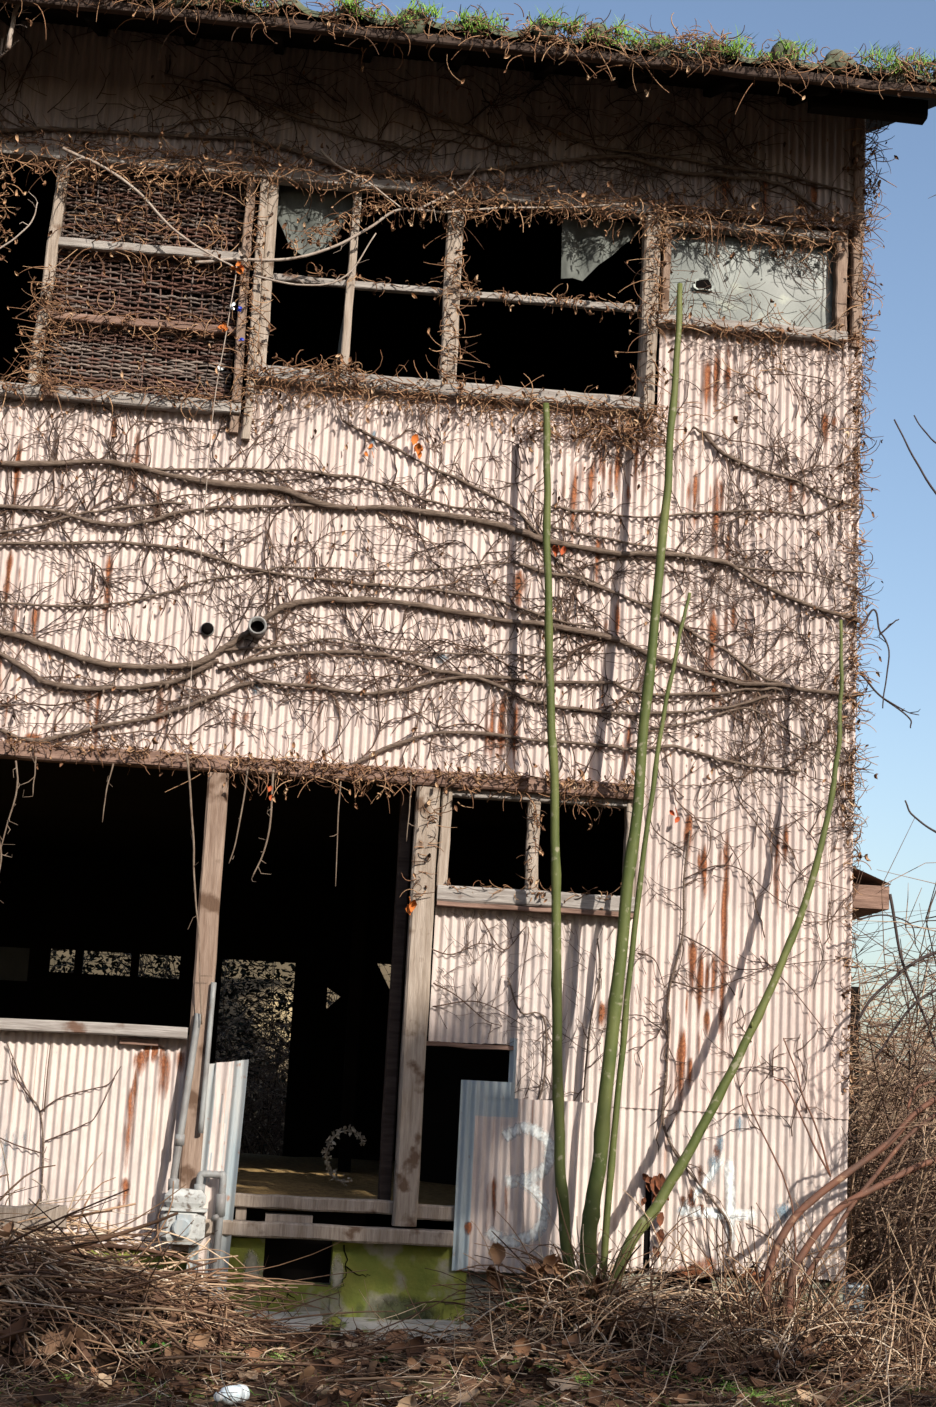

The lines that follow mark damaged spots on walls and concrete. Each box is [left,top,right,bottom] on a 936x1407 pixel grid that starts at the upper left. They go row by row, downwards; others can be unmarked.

corrosion [702,346,731,407]
corrosion [822,413,836,440]
corrosion [4,552,40,637]
corrosion [105,555,113,611]
corrosion [485,696,519,757]
corrosion [774,824,789,903]
corrosion [675,815,729,1091]
corrosion [126,1045,184,1150]
corrosion [641,1145,720,1257]
water stain [367,1296,434,1320]